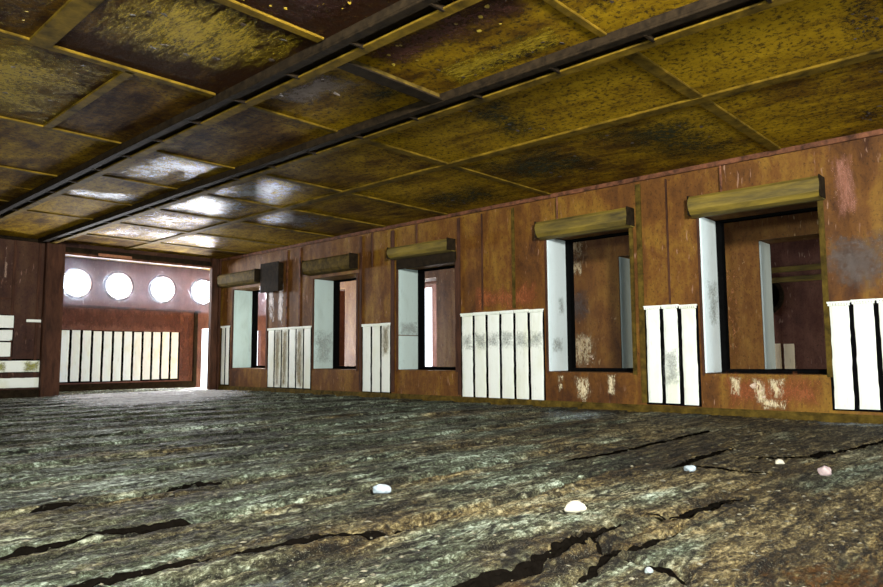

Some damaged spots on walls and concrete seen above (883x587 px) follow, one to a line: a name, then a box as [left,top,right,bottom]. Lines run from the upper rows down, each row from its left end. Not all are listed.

leakage [592,113,752,158]
peeling [731,378,786,409]
crack [30,502,81,513]
crack [167,481,224,492]
crack [0,518,191,560]
crack [65,530,404,587]
crack [451,498,744,587]